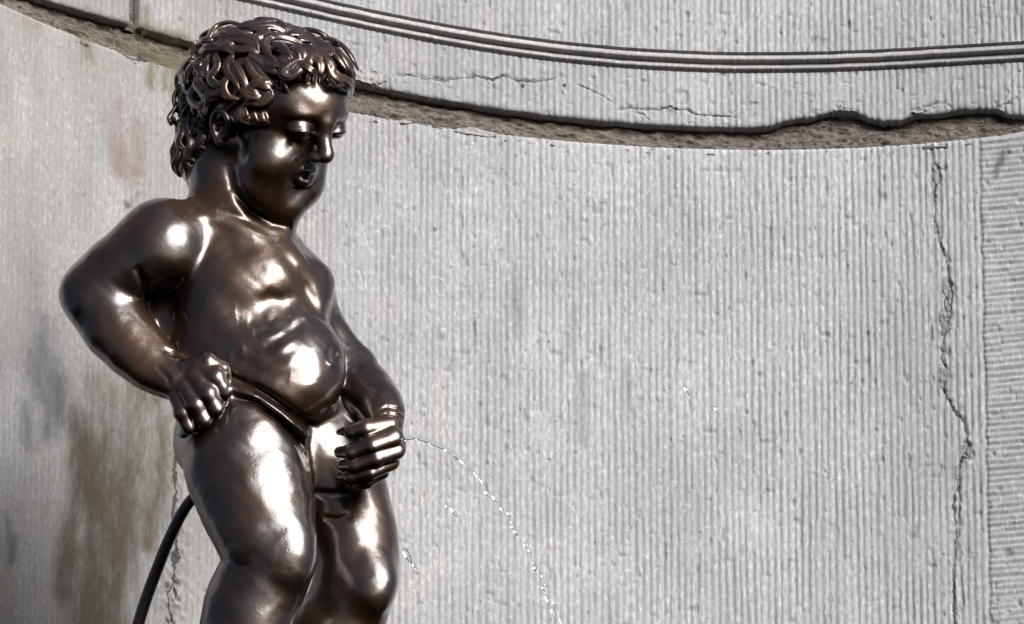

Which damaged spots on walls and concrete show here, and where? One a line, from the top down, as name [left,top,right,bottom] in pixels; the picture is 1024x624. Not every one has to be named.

crack [404,74,556,83]
spalling [455,127,497,137]
crack [581,86,736,118]
spalling [819,104,863,128]
crack [931,154,973,624]
water stain [144,421,167,549]
water stain [72,419,132,624]